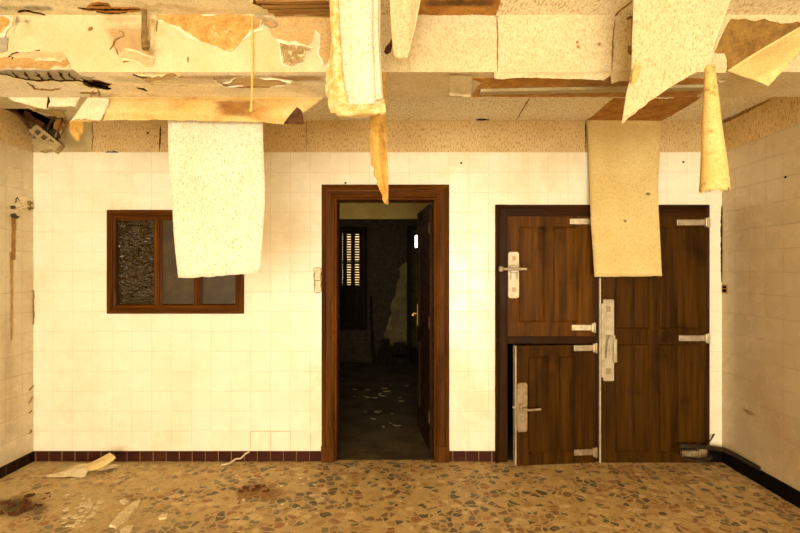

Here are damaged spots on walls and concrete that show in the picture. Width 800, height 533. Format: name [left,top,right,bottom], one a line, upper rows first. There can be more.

peeling [82,2,141,13]
peeling [0,15,324,149]
peeling [155,0,331,68]
flaking render [384,33,394,55]
peeling [472,76,704,122]
peeling [711,17,800,86]